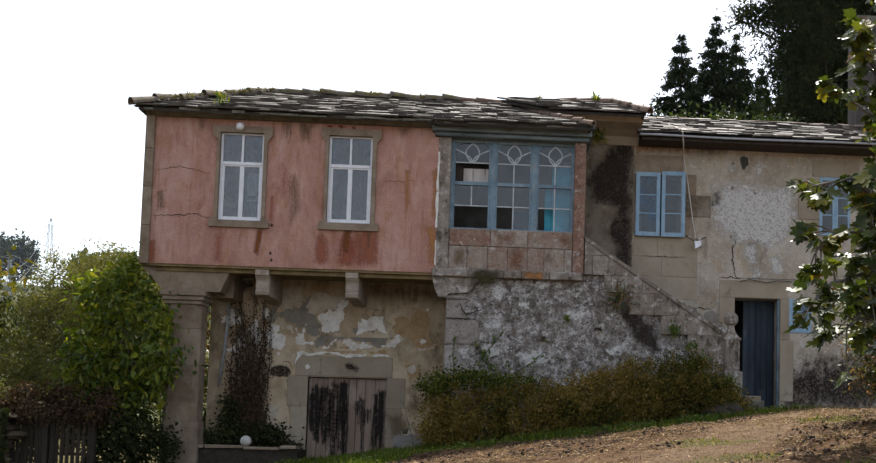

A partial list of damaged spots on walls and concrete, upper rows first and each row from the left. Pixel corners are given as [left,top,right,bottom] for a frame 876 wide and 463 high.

damp [587,145,687,266]
rust [315,235,328,264]
rust [340,231,378,265]
crack [720,212,740,279]
peeling [216,286,438,377]